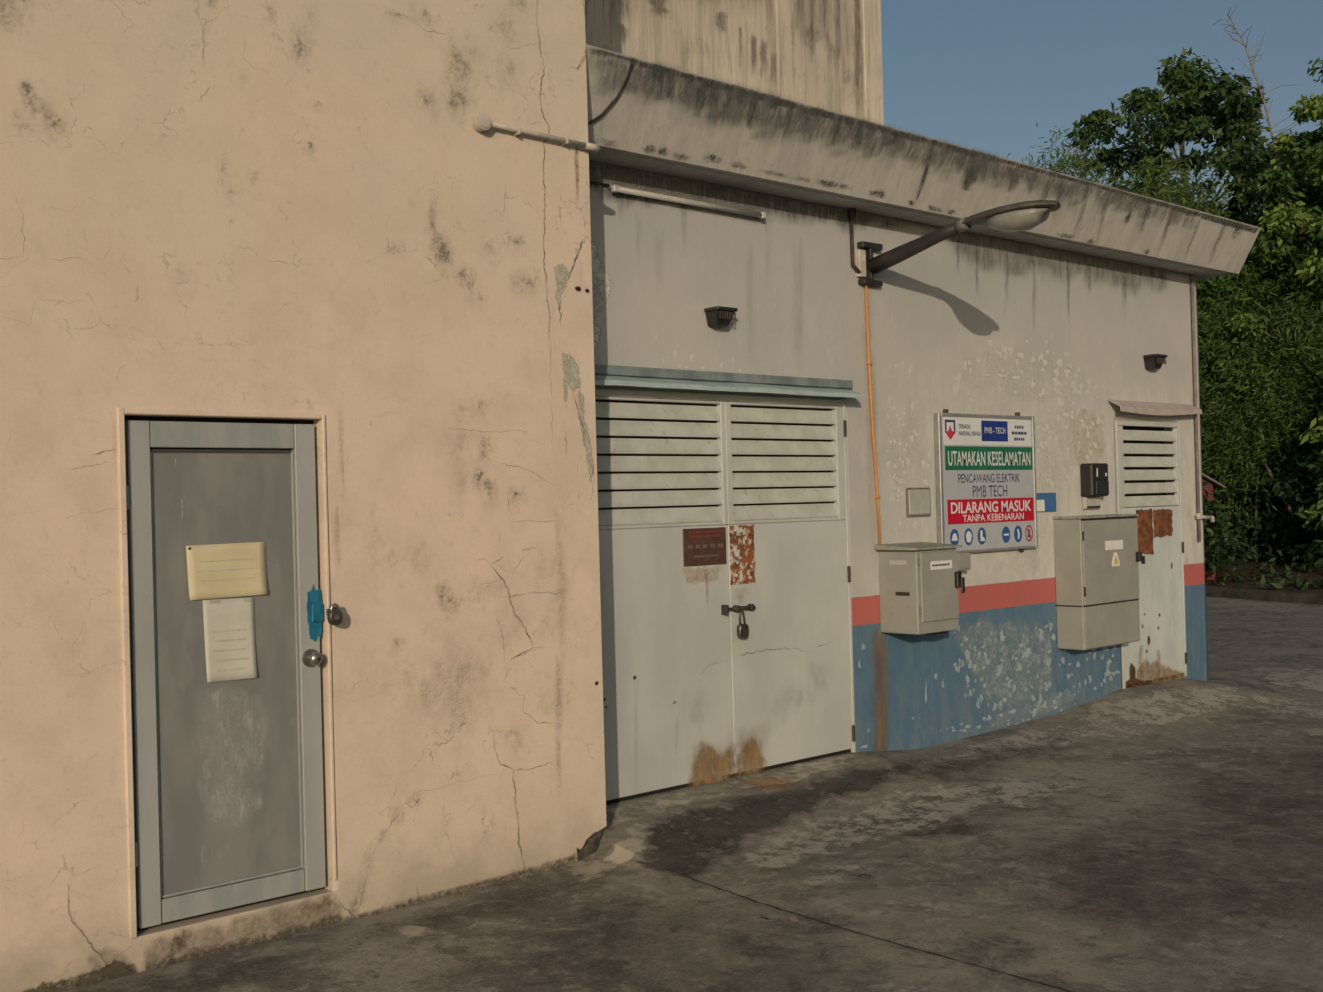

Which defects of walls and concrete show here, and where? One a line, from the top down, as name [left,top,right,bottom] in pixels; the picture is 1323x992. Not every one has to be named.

leakage [740,27,776,66]
leakage [589,50,1257,233]
peeling [555,236,610,355]
peeling [562,353,594,481]
peeling [953,339,1104,488]
peeling [940,620,1120,732]
corrosion [1137,662,1184,684]
corrosion [692,739,788,787]
leakage [645,748,1081,925]